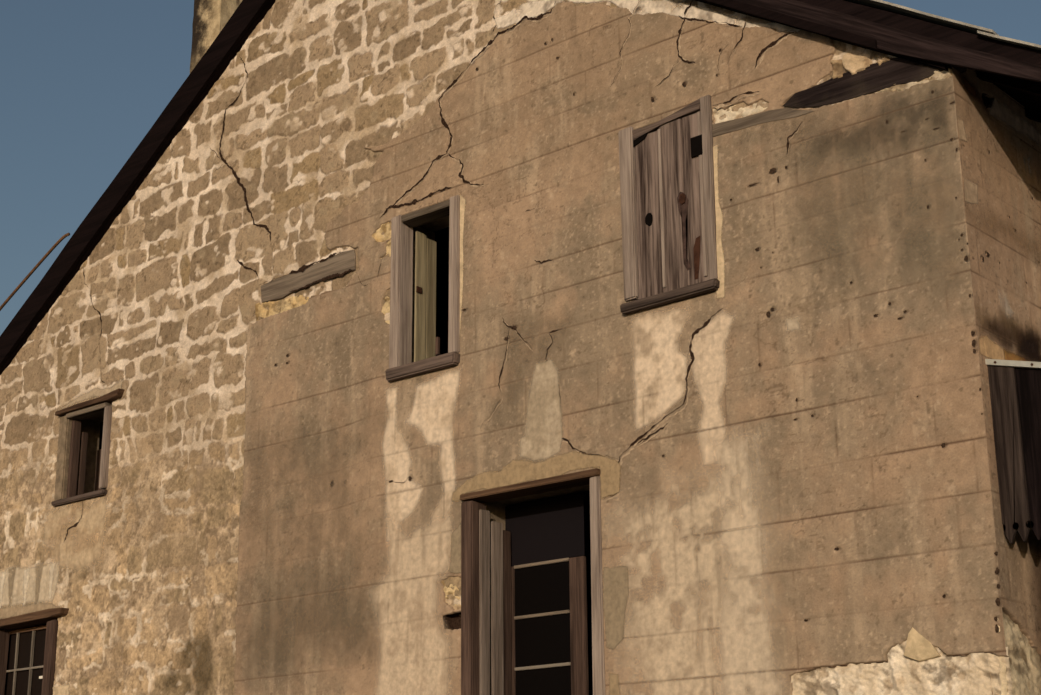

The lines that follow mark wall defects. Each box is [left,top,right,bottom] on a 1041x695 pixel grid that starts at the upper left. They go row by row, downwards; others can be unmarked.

crack [210,57,271,240]
crack [380,1,556,218]
crack [655,0,795,109]
spalling [713,102,767,124]
spalling [875,68,953,94]
crack [484,319,561,425]
crack [561,308,725,466]
rust [1004,350,1029,361]
leakage [370,370,459,695]
leakage [623,309,779,695]
spalling [791,552,1041,695]